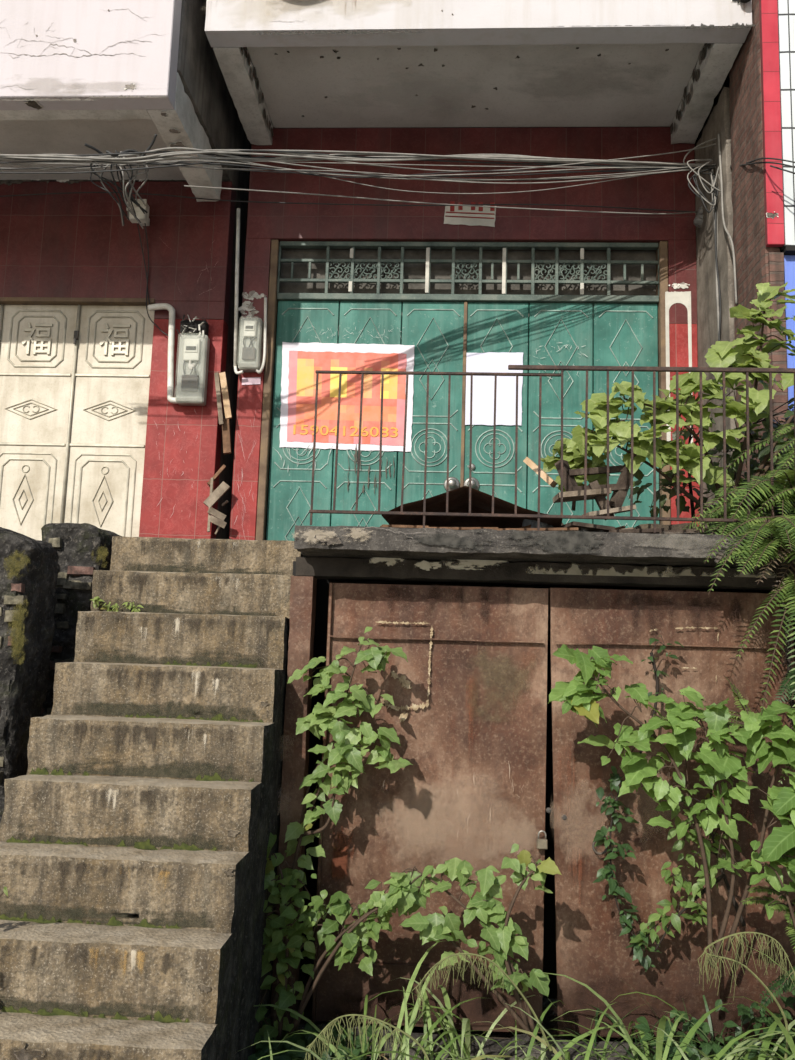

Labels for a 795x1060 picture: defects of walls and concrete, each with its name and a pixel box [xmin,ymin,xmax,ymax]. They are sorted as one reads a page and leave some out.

crack [0,8,151,58]
corrosion [331,830,354,879]